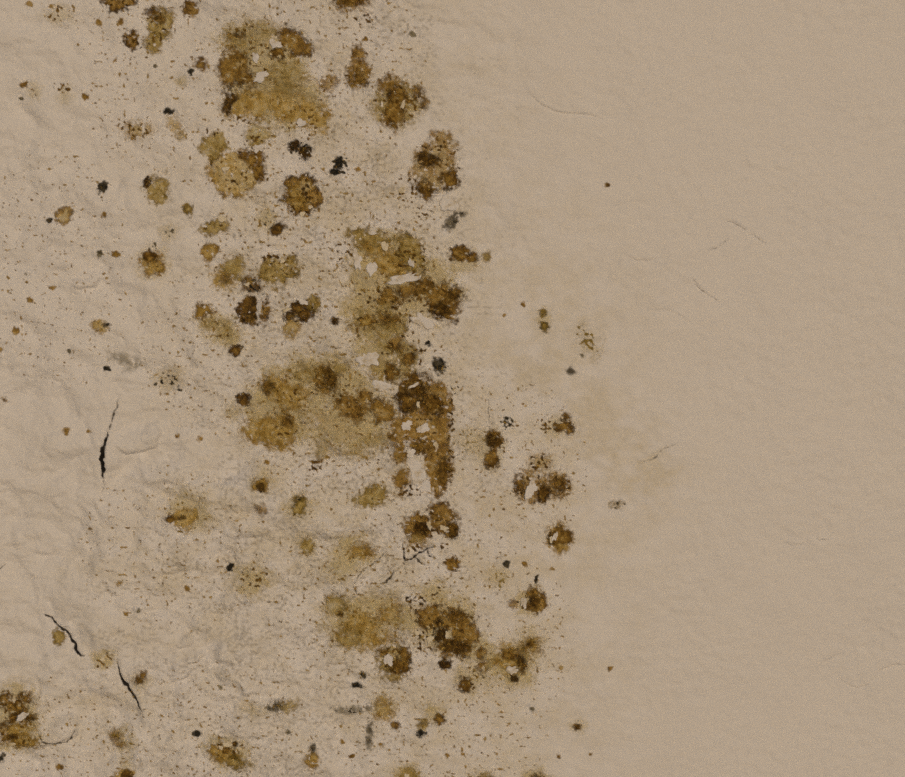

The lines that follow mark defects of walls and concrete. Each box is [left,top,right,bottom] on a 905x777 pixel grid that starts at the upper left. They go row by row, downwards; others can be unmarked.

leakage [143,169,169,205]
leakage [29,206,83,242]
leakage [139,242,165,276]
leakage [163,0,547,777]
crack [99,407,118,477]
leakage [534,413,574,441]
leakage [475,443,575,555]
leakage [96,498,221,616]
crack [45,614,83,656]
crack [117,662,142,711]
leakage [0,684,63,777]
leakage [87,710,152,777]